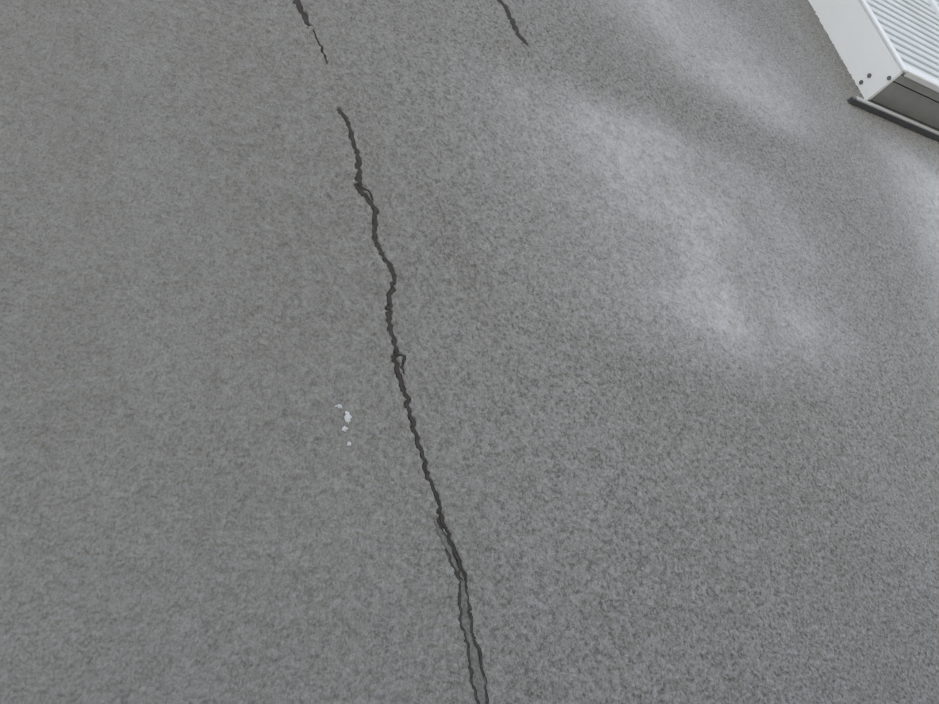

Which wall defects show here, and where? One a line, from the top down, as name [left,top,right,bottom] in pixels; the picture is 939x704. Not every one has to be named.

crack [293,0,327,62]
crack [497,0,528,45]
crack [338,109,489,704]